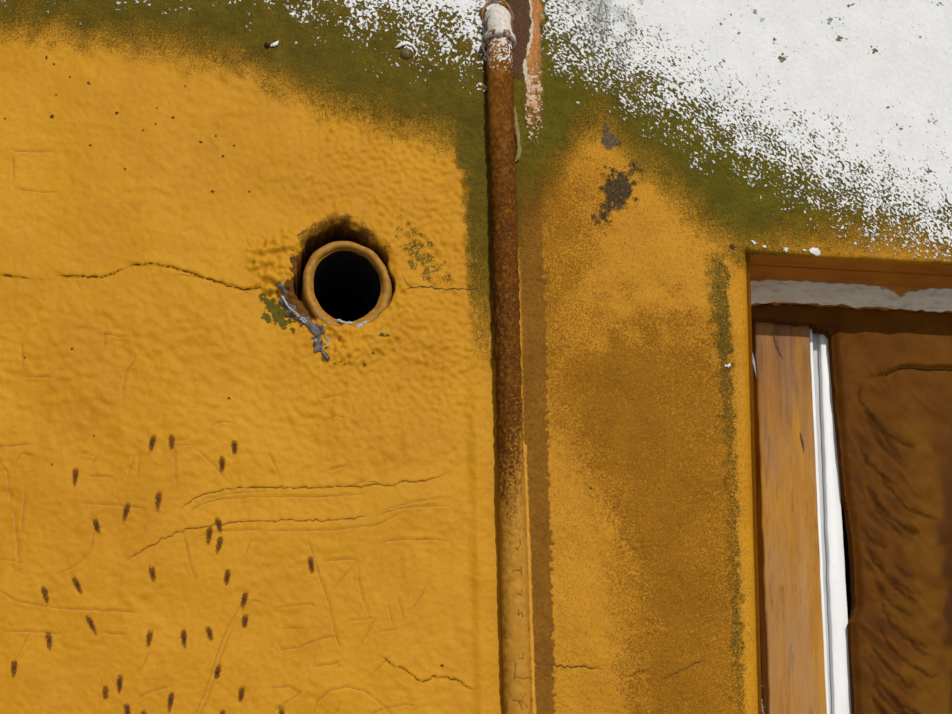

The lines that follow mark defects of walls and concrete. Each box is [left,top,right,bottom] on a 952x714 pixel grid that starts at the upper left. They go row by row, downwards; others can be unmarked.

corrosion [525,0,545,110]
crack [57,263,263,292]
crack [885,367,952,377]
water stain [539,151,744,714]
crack [185,473,445,505]
crack [128,515,368,559]